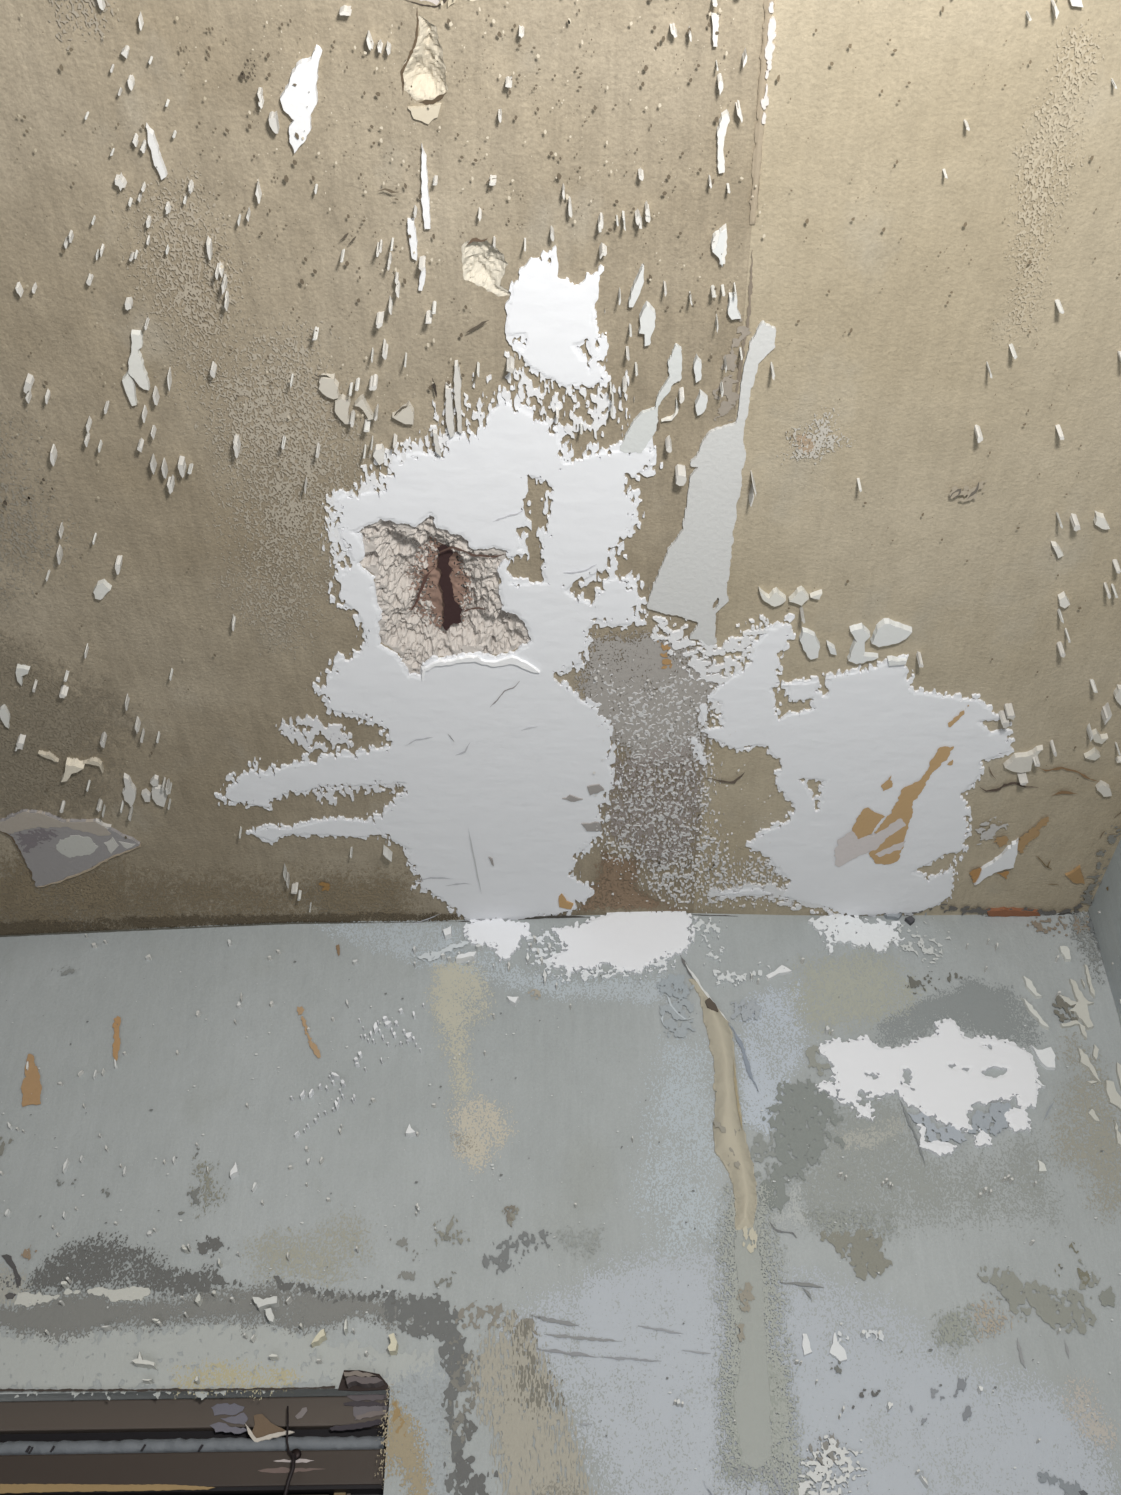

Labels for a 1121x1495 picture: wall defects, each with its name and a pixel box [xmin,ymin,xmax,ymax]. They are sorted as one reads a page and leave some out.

peeling [280,44,322,153]
peeling [628,264,656,346]
peeling [122,330,150,406]
rust [406,536,481,633]
spalling [359,515,531,674]
peeling [799,618,912,666]
rust [112,1016,121,1061]
rust [297,1006,321,1058]
rust [21,1054,42,1107]
leakage [178,1148,230,1219]
leakage [0,1200,470,1307]
leakage [482,1203,605,1275]